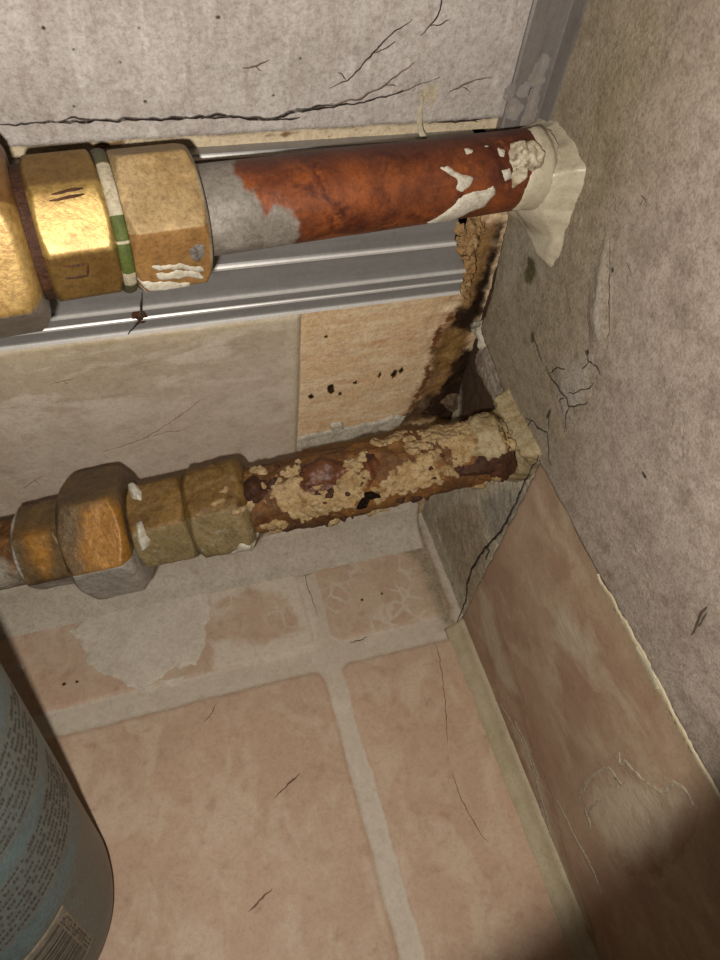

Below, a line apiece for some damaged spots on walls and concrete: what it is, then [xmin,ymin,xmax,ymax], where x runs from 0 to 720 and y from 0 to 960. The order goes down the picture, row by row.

crack [0,0,491,127]
leakage [393,212,508,429]
flaking render [471,320,504,408]
crack [457,236,633,621]
crack [434,642,448,742]
crack [452,773,487,841]